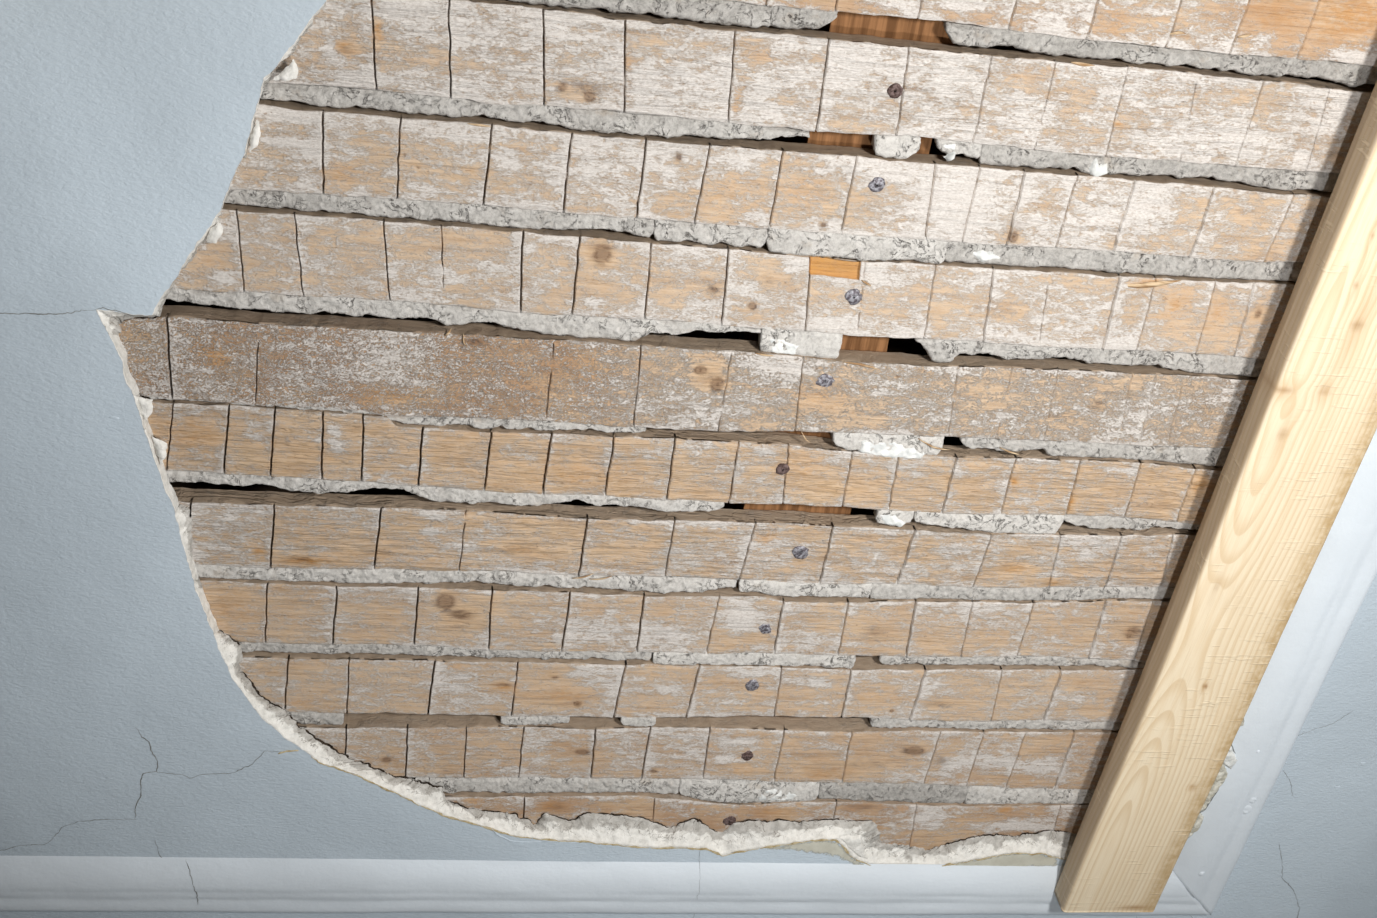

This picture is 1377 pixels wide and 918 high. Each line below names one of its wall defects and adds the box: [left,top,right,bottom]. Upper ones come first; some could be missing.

crack [0,307,159,321]
spalling [96,0,1077,866]
crack [0,630,871,902]
spalling [1188,745,1238,838]
crack [932,830,1065,849]